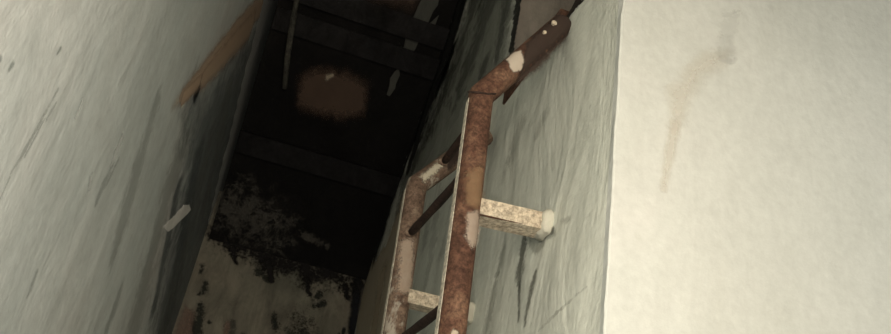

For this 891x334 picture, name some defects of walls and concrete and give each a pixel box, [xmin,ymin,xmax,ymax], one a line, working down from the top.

water stain [271,290,327,334]
water stain [339,197,401,334]